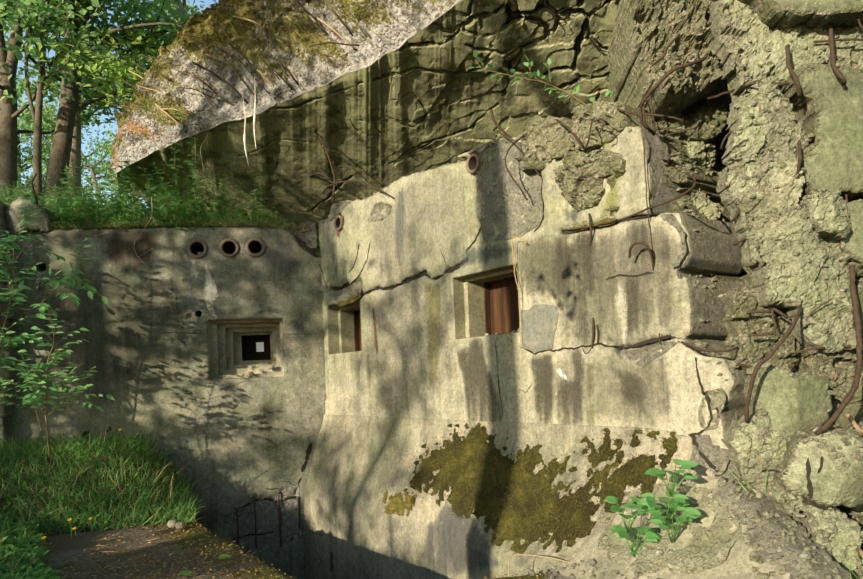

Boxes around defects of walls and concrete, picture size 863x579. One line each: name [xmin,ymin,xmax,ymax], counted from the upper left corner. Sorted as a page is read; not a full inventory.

crack [270,0,610,166]
spalling [555,118,605,150]
spalling [570,53,708,270]
peeling [838,199,863,269]
crack [284,225,482,391]
leakage [616,280,647,339]
leakage [458,339,500,421]
leakage [531,350,582,422]
crack [521,335,677,423]
crack [688,357,729,482]
spalling [229,482,302,555]
leakage [428,508,495,574]